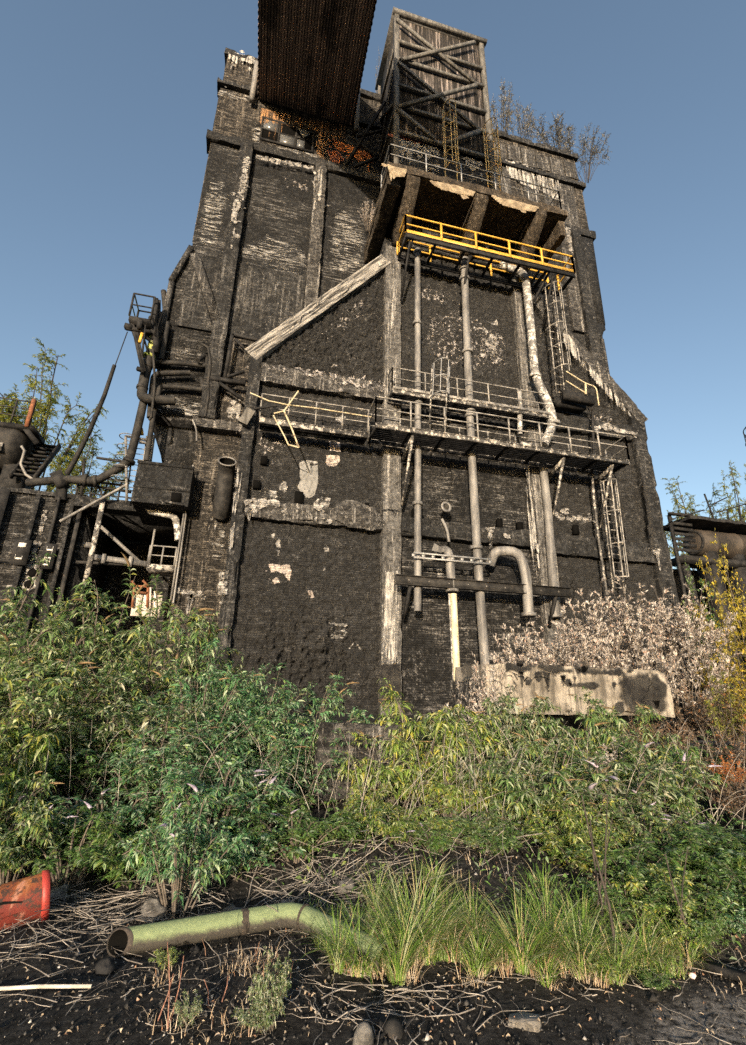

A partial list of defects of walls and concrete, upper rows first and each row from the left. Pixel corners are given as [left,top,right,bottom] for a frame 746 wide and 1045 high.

rust [260,109,373,172]
peeling [326,441,341,466]
peeling [266,533,292,584]
damp [461,663,473,677]
damp [505,661,668,729]